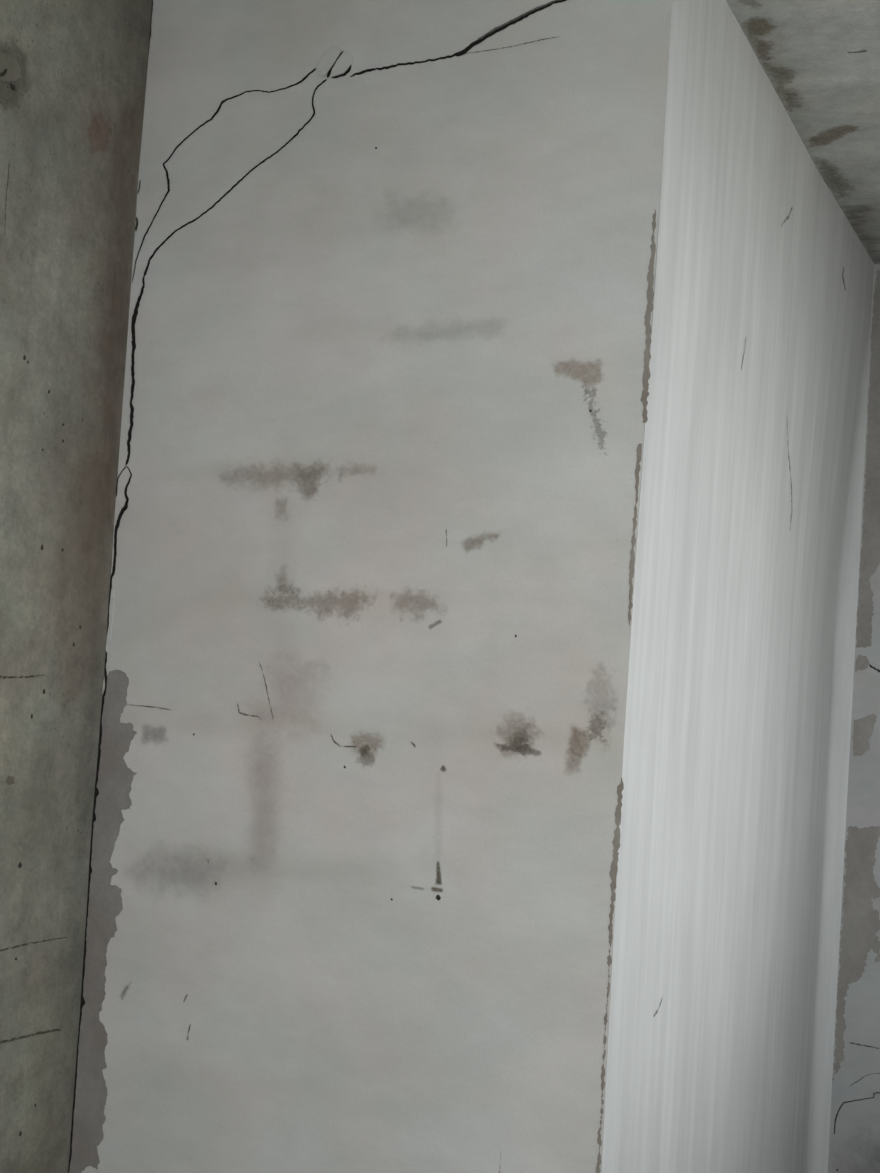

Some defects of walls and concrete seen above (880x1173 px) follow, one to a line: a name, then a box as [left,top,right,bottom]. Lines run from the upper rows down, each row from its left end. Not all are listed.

flaking render [106,589,114,650]
crack [68,0,567,1173]
flaking render [852,713,877,756]
flaking render [855,270,880,672]
flaking render [69,670,137,1173]
flaking render [832,826,880,1084]
crack [834,1042,880,1134]